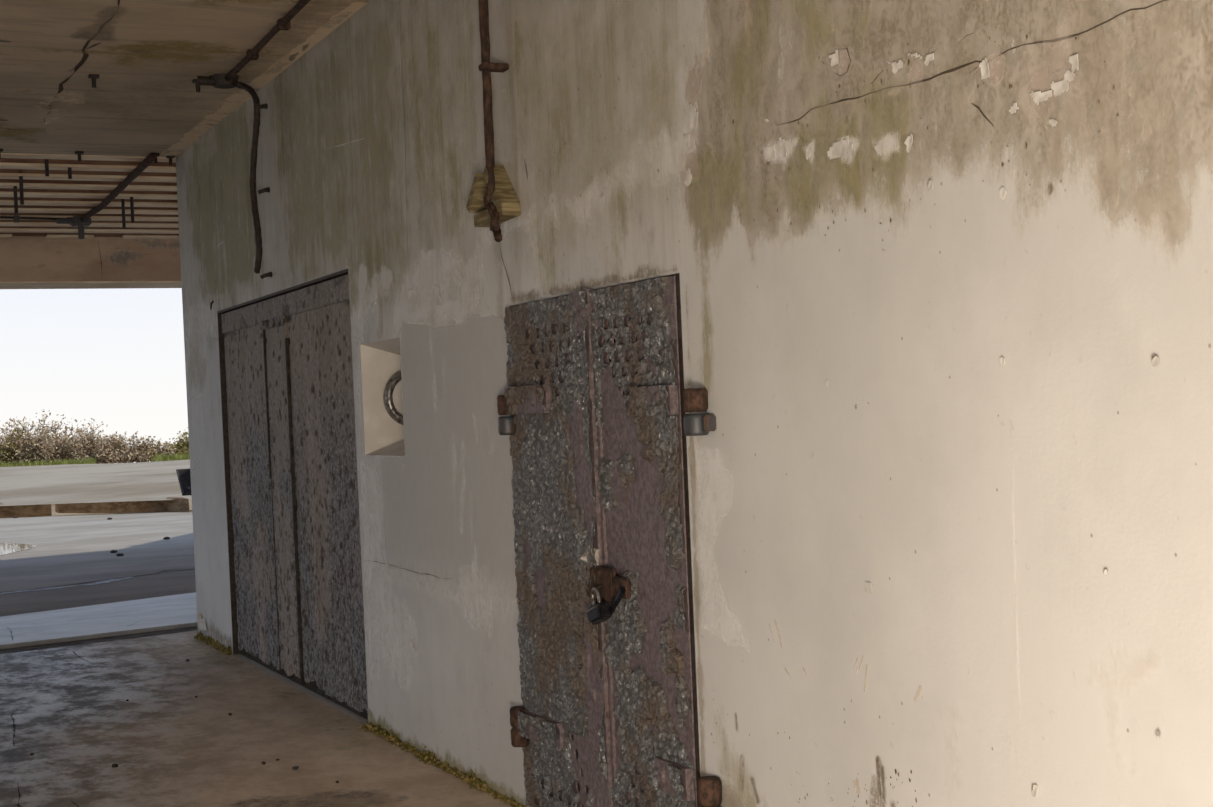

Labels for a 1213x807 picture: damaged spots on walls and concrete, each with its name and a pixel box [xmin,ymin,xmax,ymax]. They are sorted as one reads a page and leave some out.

crack [44,0,120,123]
spalling [829,50,847,68]
peeling [887,53,934,79]
crack [778,0,1167,128]
peeling [979,58,1003,79]
peeling [1030,50,1079,105]
peeling [764,135,858,162]
peeling [874,134,913,155]
leakage [658,0,1213,267]
leakage [720,756,759,807]
leakage [848,757,917,807]